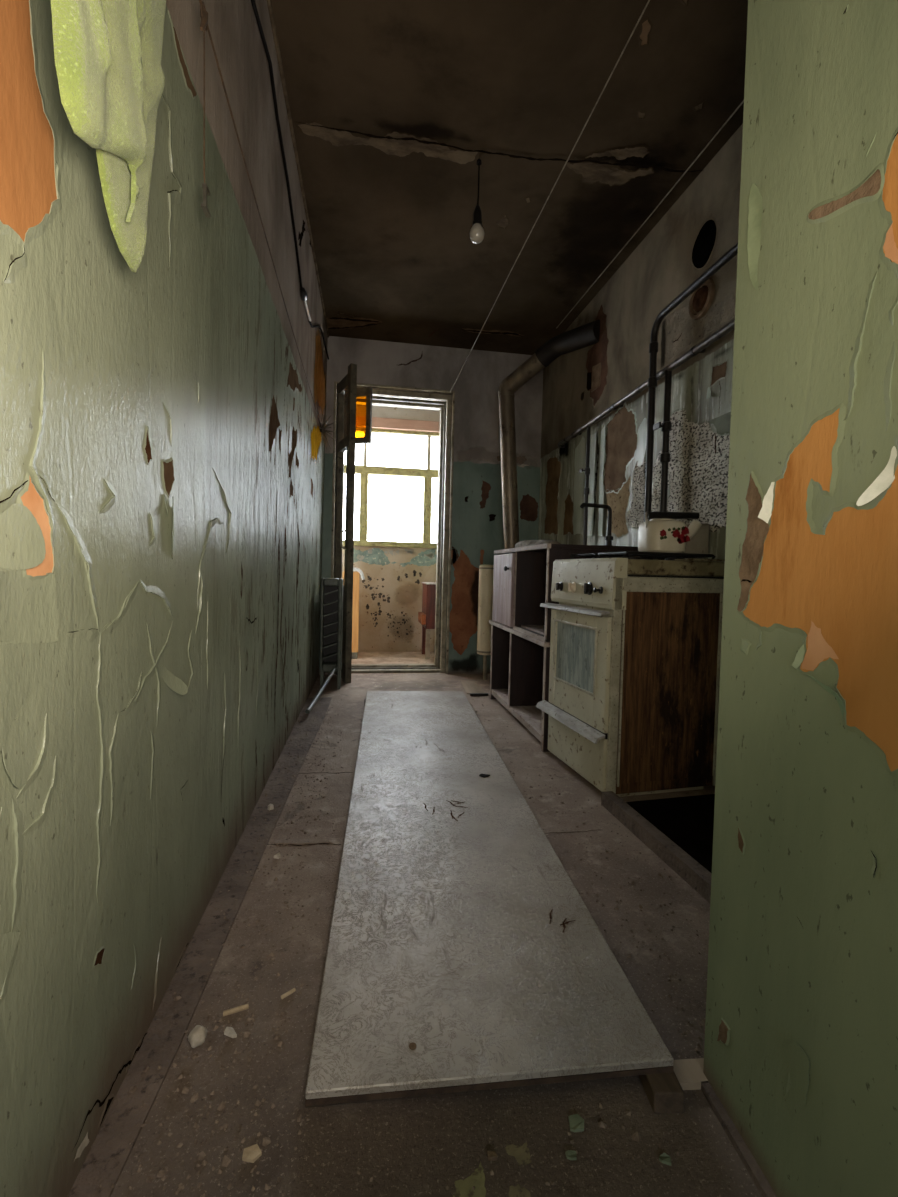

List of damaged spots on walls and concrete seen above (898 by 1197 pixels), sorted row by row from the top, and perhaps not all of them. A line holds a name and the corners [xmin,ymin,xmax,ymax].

peeling [0,0,62,251]
crack [295,119,704,187]
peeling [806,127,898,279]
peeling [143,426,175,559]
peeling [268,360,302,499]
flaking render [519,359,731,539]
peeling [0,470,59,788]
peeling [353,546,485,656]
peeling [737,402,898,777]